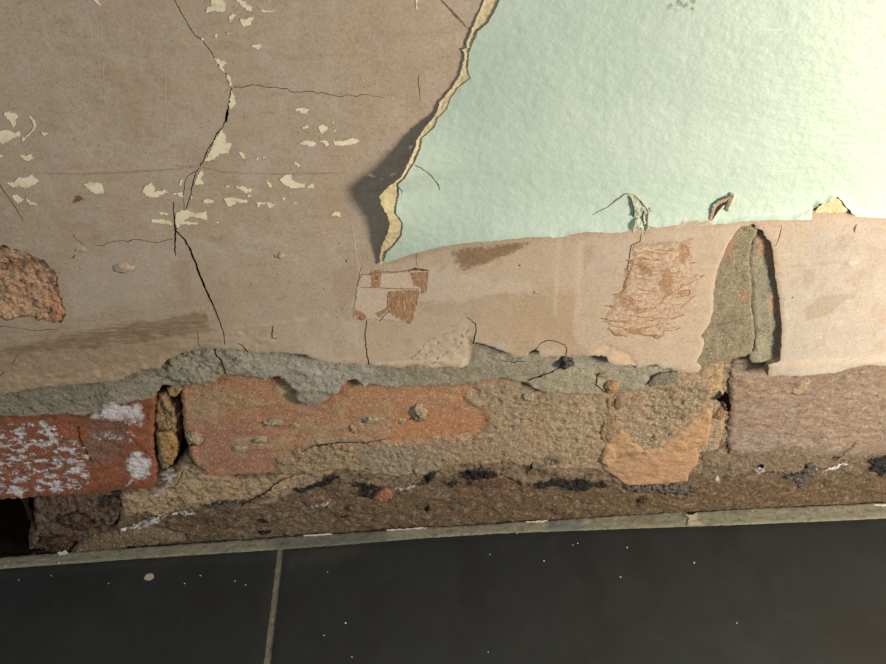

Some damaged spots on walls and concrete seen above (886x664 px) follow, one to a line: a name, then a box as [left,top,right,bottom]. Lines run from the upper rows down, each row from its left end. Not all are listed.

peeling [195,130,245,185]
peeling [151,185,297,228]
crack [72,1,383,374]
spalling [0,245,66,322]
peeling [354,270,429,324]
spalling [697,224,780,366]
water stain [91,401,144,442]
flaking render [0,342,680,416]
spalling [717,391,731,412]
water stain [0,420,90,499]
water stain [125,451,152,486]
spalling [0,497,45,556]